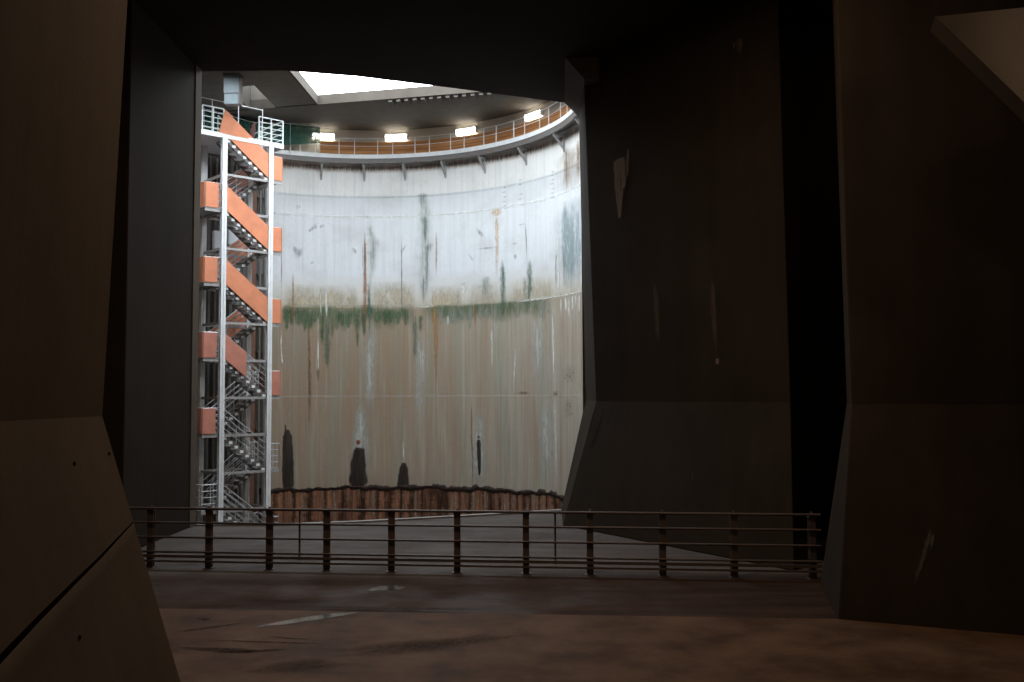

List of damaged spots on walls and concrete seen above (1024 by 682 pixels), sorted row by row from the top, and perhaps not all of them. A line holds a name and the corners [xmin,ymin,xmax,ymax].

damp [288,292,354,317]
damp [522,211,580,374]
damp [367,290,459,390]
damp [282,425,294,488]
damp [349,414,368,486]
damp [397,449,409,486]
damp [473,420,484,475]